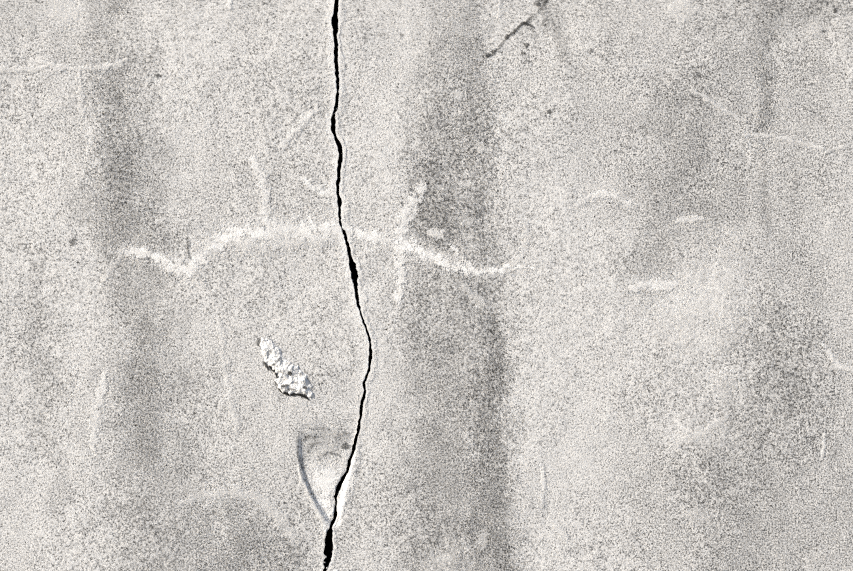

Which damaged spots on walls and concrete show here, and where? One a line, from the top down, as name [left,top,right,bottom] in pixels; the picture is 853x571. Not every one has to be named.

crack [320,0,377,571]
crack [486,0,548,57]